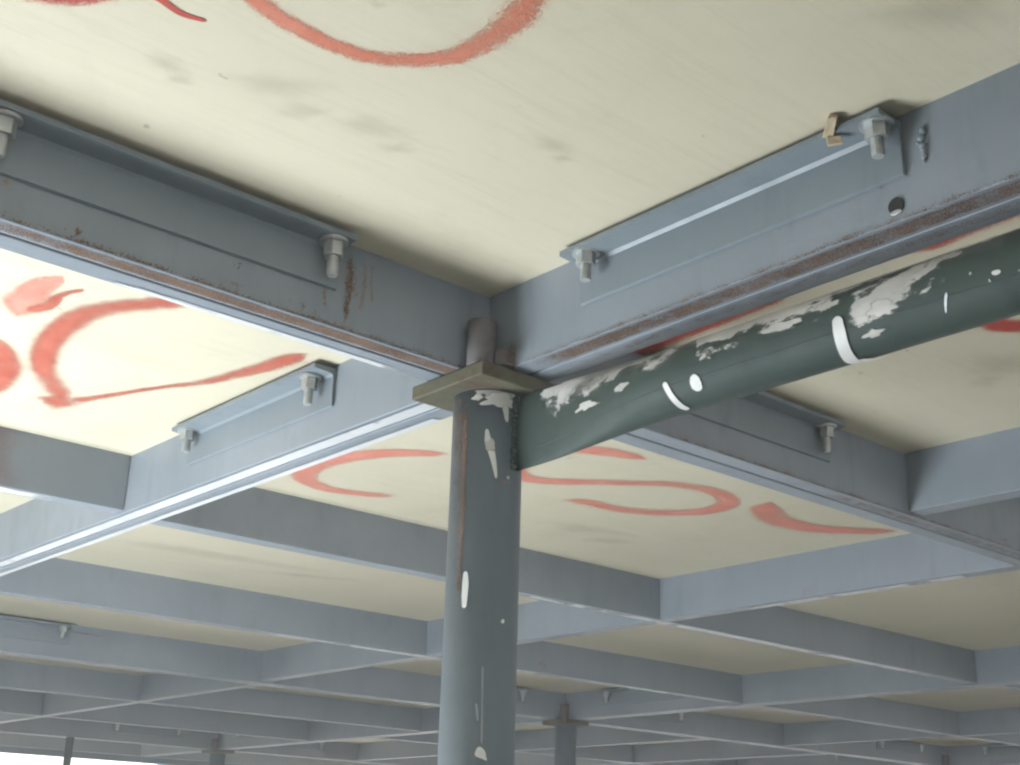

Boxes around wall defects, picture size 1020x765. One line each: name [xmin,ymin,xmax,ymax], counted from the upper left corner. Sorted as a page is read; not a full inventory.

rust [0,211,464,374]
rust [515,171,1020,365]
peeling [540,228,1020,416]
peeling [484,438,496,451]
peeling [471,390,516,422]